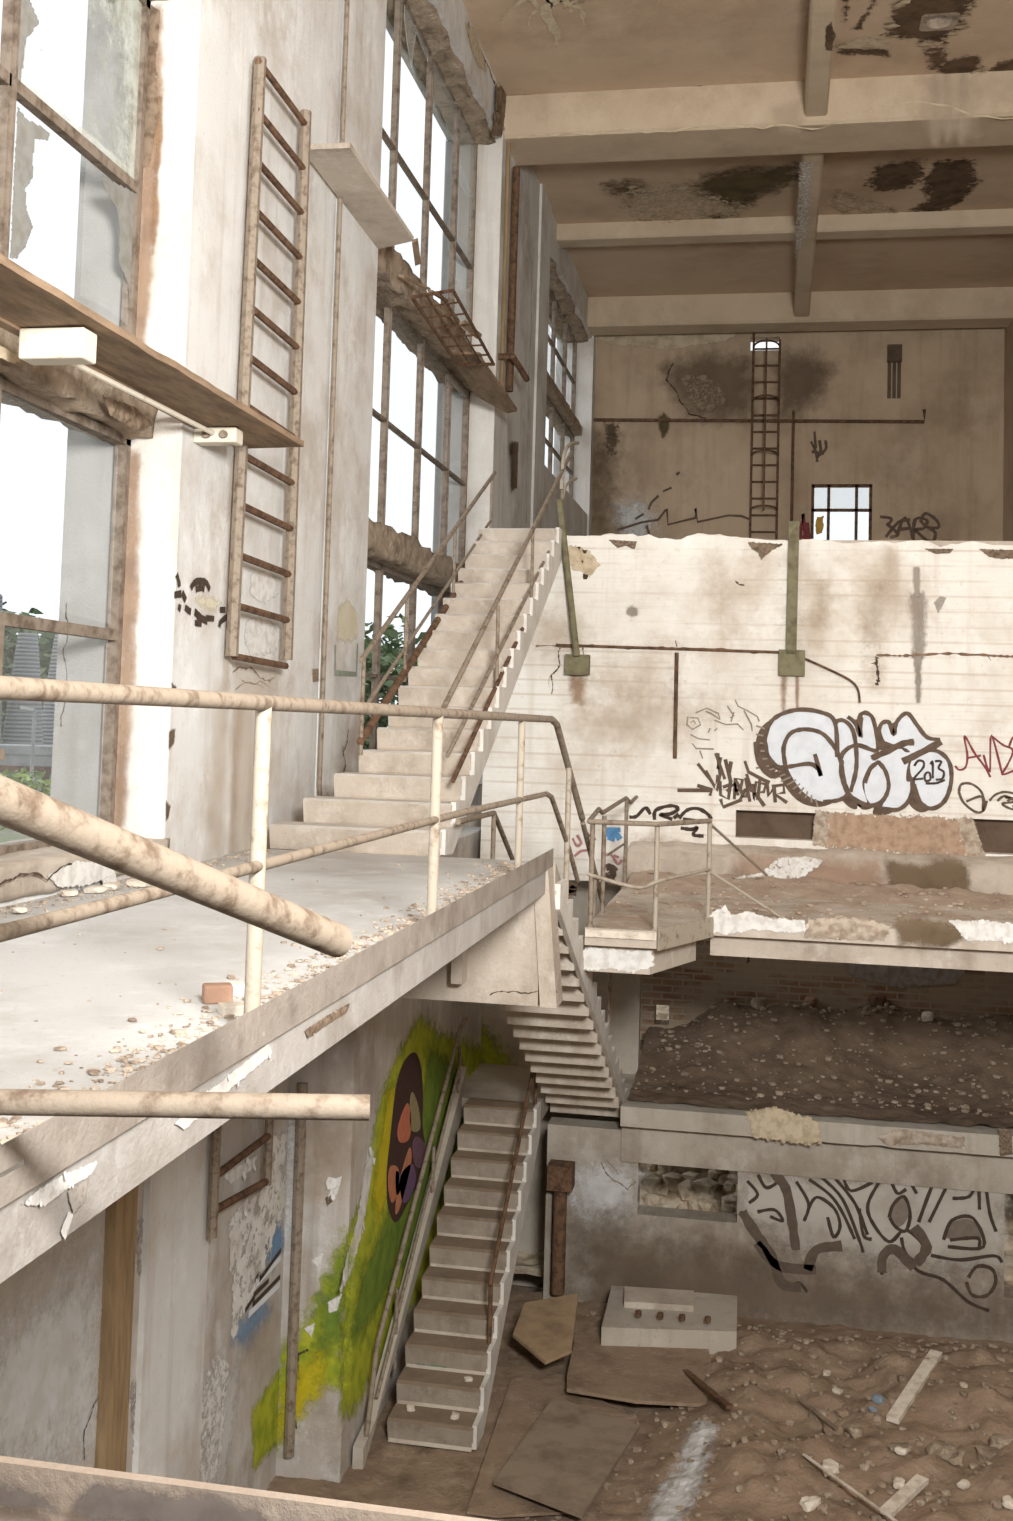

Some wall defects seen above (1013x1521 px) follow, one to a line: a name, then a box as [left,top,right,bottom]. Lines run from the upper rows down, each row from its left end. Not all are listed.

water stain [499,0,586,48]
water stain [837,0,1013,74]
water stain [693,165,800,219]
water stain [864,159,982,212]
water stain [674,359,749,419]
water stain [782,357,828,408]
crack [0,863,72,887]